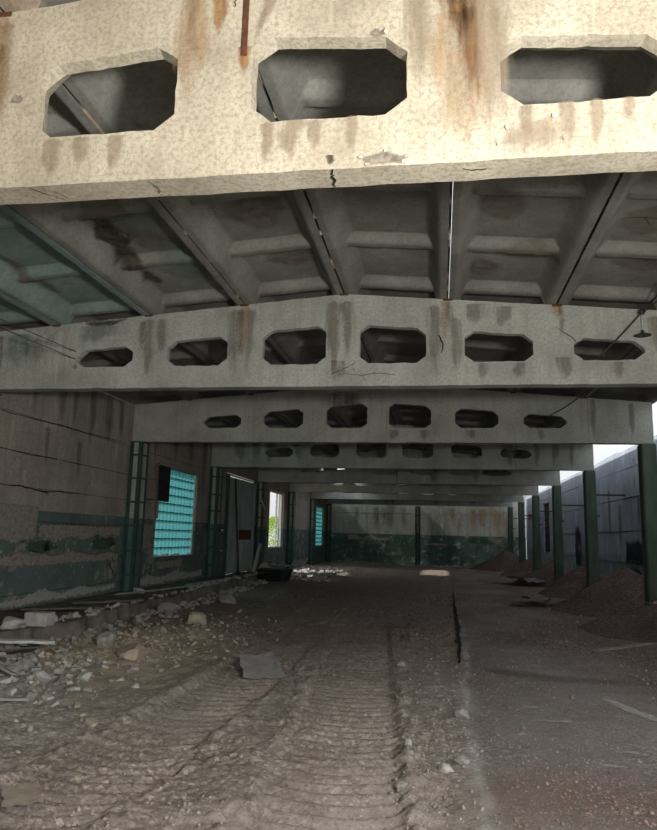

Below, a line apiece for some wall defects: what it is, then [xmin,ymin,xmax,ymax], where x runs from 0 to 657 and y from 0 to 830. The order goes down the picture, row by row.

rust [215,0,227,28]
rust [239,46,249,68]
rust [441,0,481,81]
damp [82,199,170,283]
crack [0,483,78,495]
peeling [0,503,122,568]